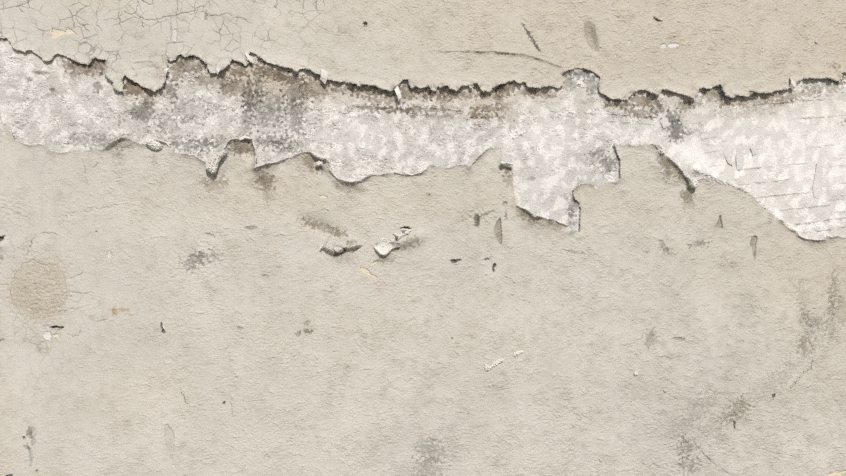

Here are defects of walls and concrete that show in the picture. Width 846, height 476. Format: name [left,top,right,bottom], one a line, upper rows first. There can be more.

peeling [0,38,846,241]
damp [668,119,685,142]